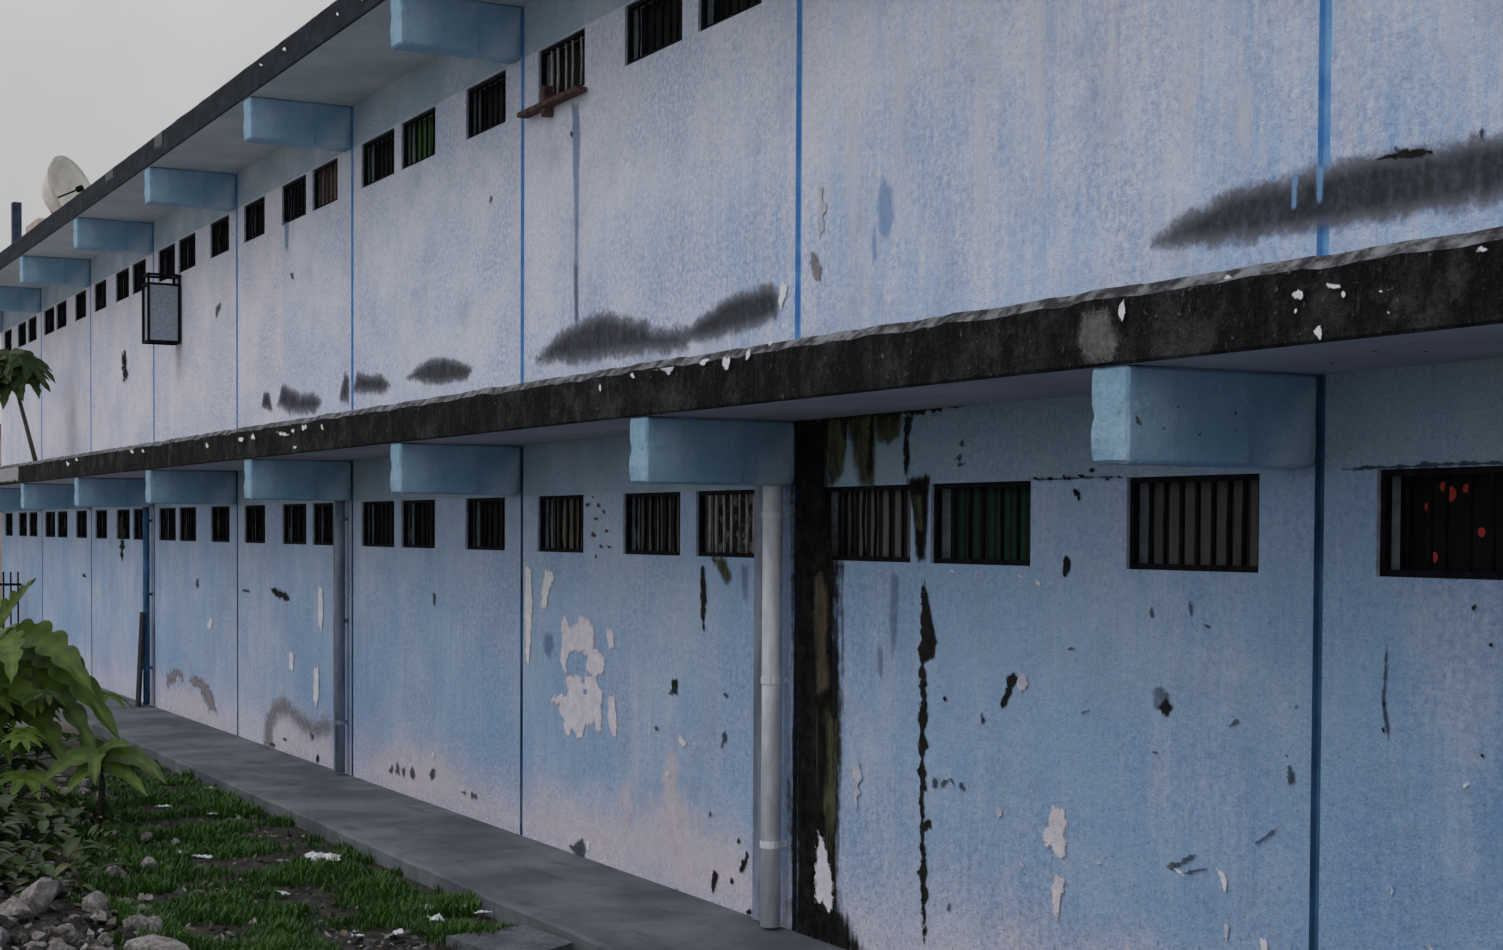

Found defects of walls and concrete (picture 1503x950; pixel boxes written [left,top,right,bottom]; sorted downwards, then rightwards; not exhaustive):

leakage [1151,128,1503,249]
mould [262,385,322,414]
mould [340,372,390,402]
mould [407,358,471,384]
leakage [535,281,788,365]
leakage [700,349,750,370]
crack [1343,460,1503,471]
peeling [524,564,554,664]
leakage [164,668,229,729]
peeling [551,613,617,739]
leakage [786,406,964,950]
peeling [1042,805,1068,921]